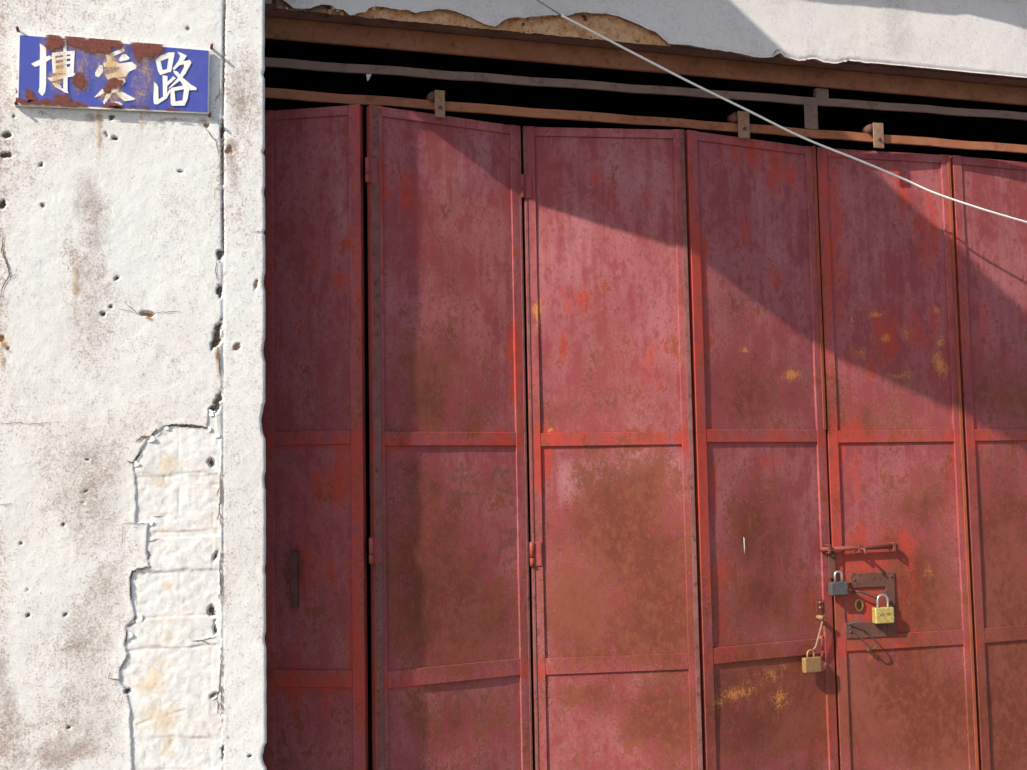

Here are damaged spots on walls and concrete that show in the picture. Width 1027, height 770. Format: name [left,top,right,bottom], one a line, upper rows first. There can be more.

flaking render [276,0,671,47]
crack [1,234,14,292]
flaking render [112,392,224,770]